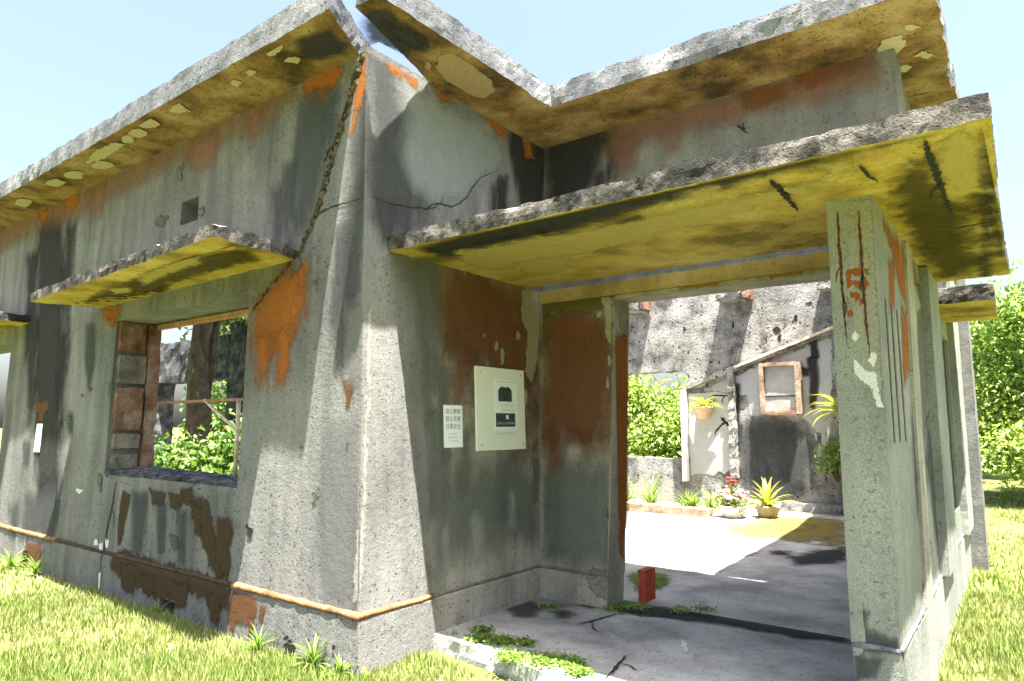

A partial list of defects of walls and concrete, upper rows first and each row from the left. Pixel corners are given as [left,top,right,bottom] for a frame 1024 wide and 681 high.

peeling [44,119,160,187]
corrosion [349,57,366,134]
crack [251,51,500,313]
peeling [390,49,495,98]
damp [479,129,617,214]
crack [769,180,799,212]
crack [923,141,954,219]
corrosion [252,262,307,383]
flaking render [846,198,884,408]
corrosion [883,217,917,381]
corrosion [437,269,629,559]
damp [733,384,814,501]